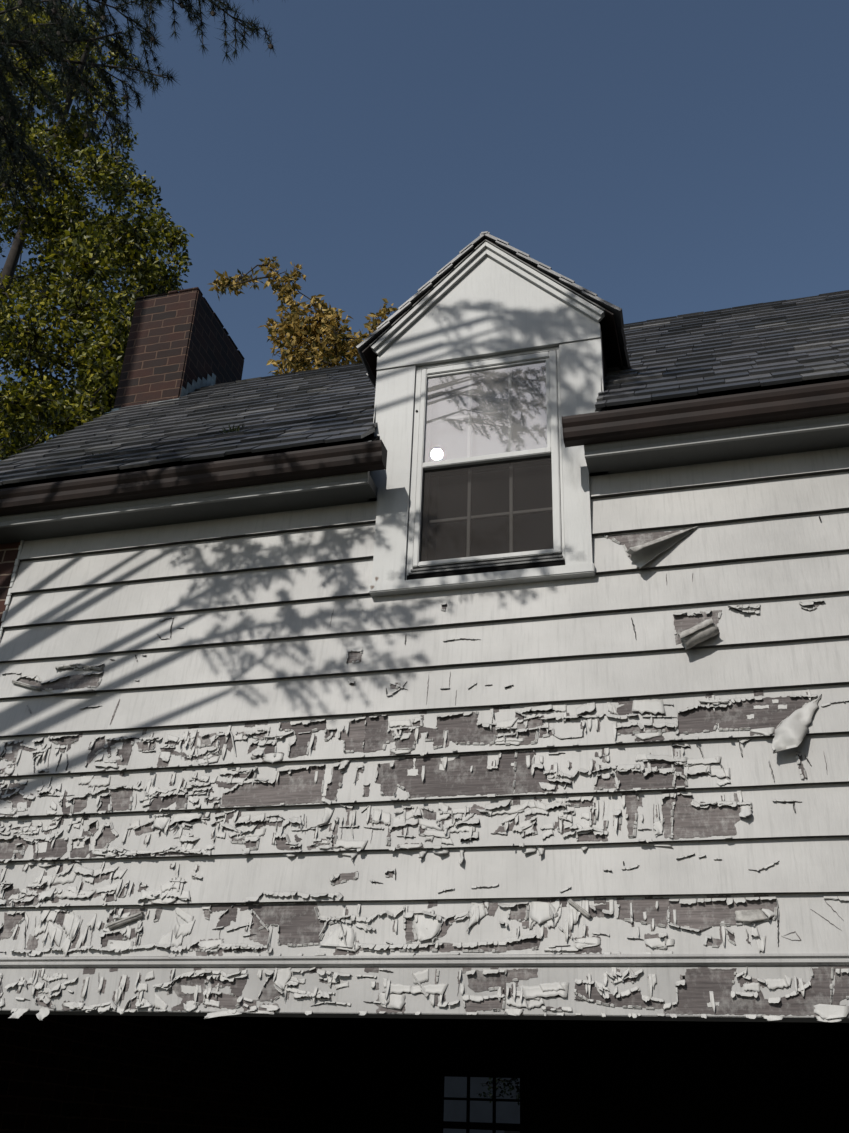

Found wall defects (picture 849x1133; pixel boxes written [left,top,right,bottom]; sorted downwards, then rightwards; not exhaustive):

peeling [604,526,698,569]
peeling [673,604,761,650]
peeling [799,600,824,611]
peeling [2,663,105,694]
peeling [0,690,849,1023]